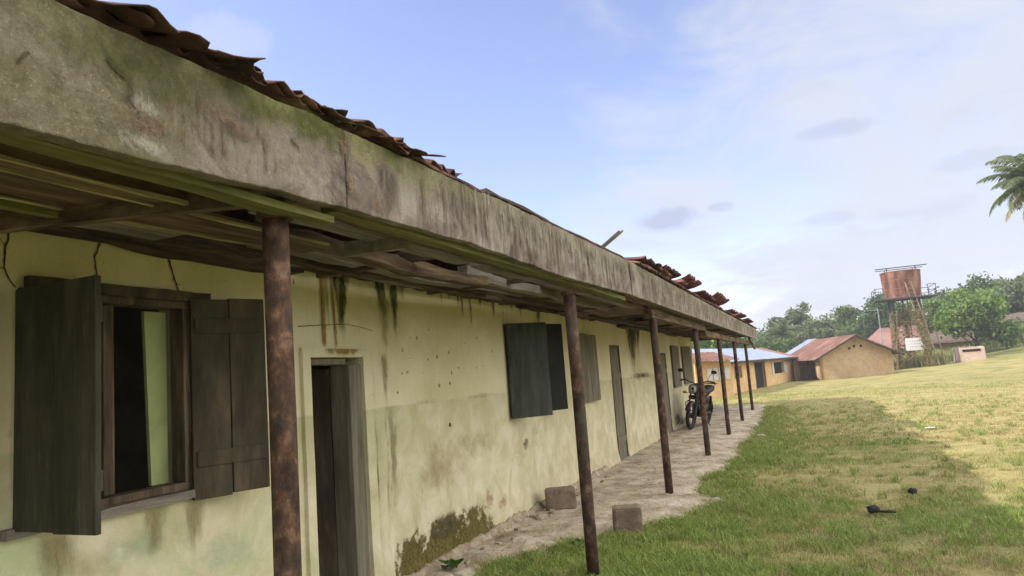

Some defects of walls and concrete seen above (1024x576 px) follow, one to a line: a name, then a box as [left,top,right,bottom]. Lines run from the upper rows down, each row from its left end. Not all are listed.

crack [0,233,16,287]
crack [168,259,179,290]
corrosion [320,277,355,354]
damp [333,276,346,325]
damp [375,281,404,332]